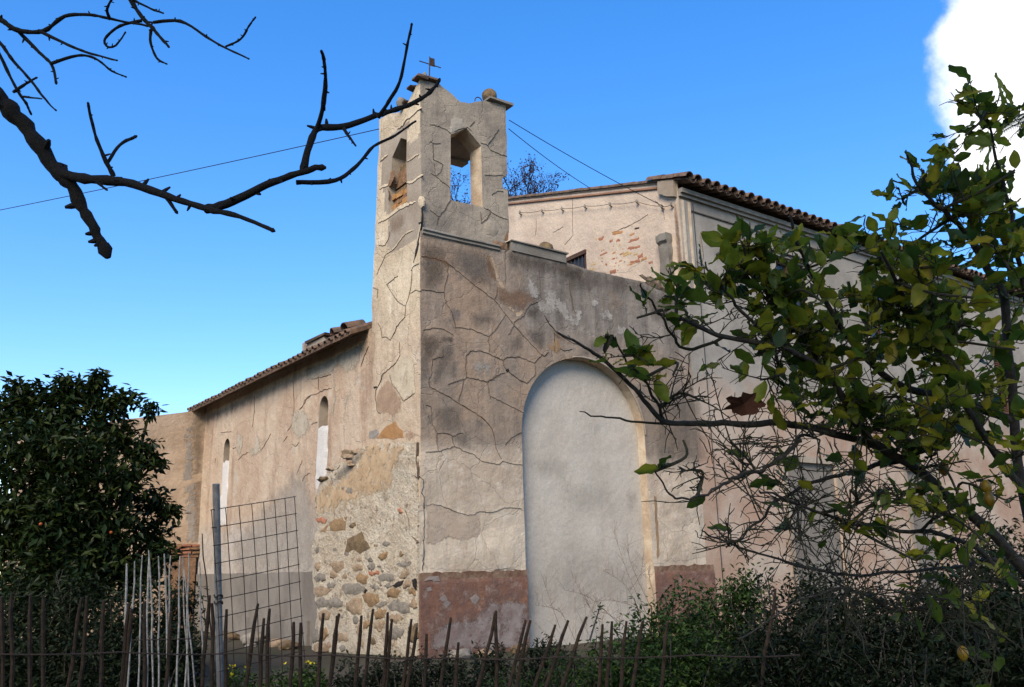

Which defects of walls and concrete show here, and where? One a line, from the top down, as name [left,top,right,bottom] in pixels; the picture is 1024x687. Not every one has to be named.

crack [215,374,332,481]
spalling [311,357,529,658]
crack [361,107,576,571]
spalling [590,224,665,292]